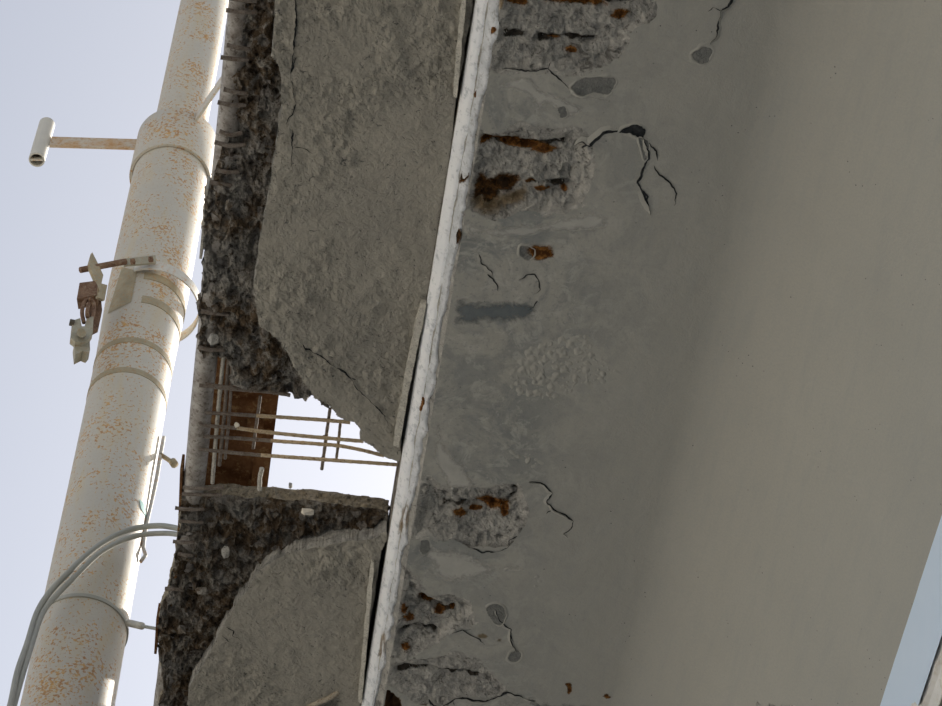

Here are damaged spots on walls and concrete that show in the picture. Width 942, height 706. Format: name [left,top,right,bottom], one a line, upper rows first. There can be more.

spalling [490,0,658,98]
crack [709,0,735,45]
spalling [466,105,596,221]
crack [574,125,677,214]
peeling [617,122,652,162]
crack [477,255,498,290]
rust [527,245,554,261]
spalling [157,0,397,706]
spalling [411,475,530,556]
crack [529,481,573,537]
spalling [384,564,510,706]
crack [429,692,535,706]